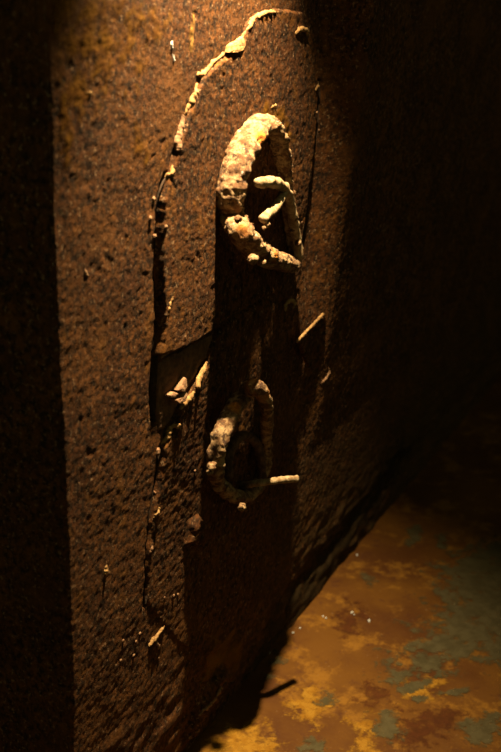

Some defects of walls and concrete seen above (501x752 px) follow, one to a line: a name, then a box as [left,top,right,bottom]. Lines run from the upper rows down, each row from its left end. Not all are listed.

corrosion [263,100,292,138]
crack [142,9,279,604]
flaking render [296,313,326,368]
flaking render [155,335,212,430]
corrosion [282,686,332,726]
corrosion [403,676,447,700]
corrosion [208,722,279,752]
corrosion [345,717,380,752]